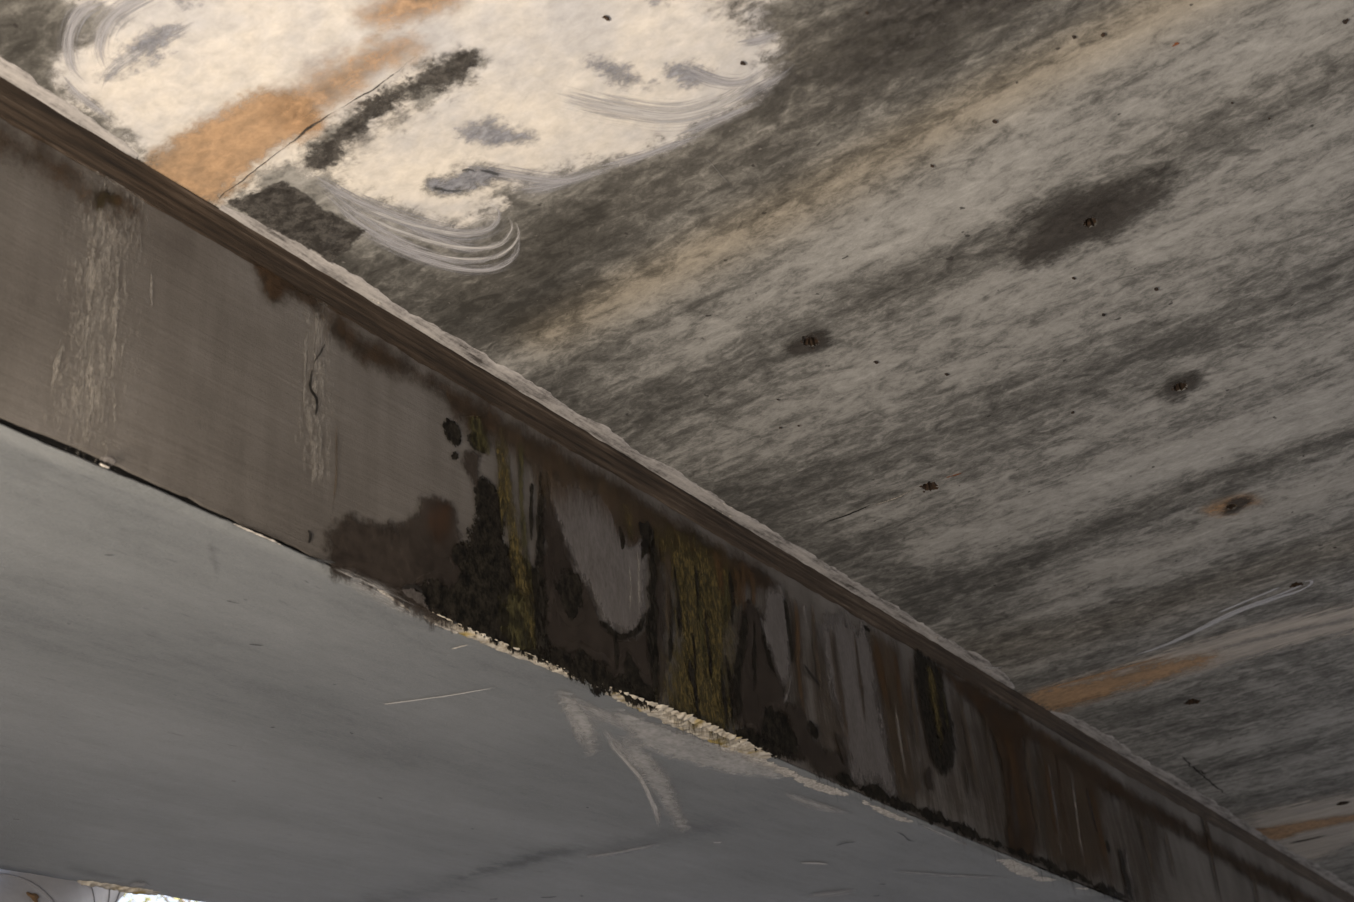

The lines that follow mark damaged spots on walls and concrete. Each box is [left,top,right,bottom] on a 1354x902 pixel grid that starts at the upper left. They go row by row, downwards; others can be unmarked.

leakage [1007,169,1178,270]
leakage [63,179,132,437]
crack [309,344,325,416]
leakage [325,495,462,632]
leakage [471,416,756,729]
rust [1210,496,1253,515]